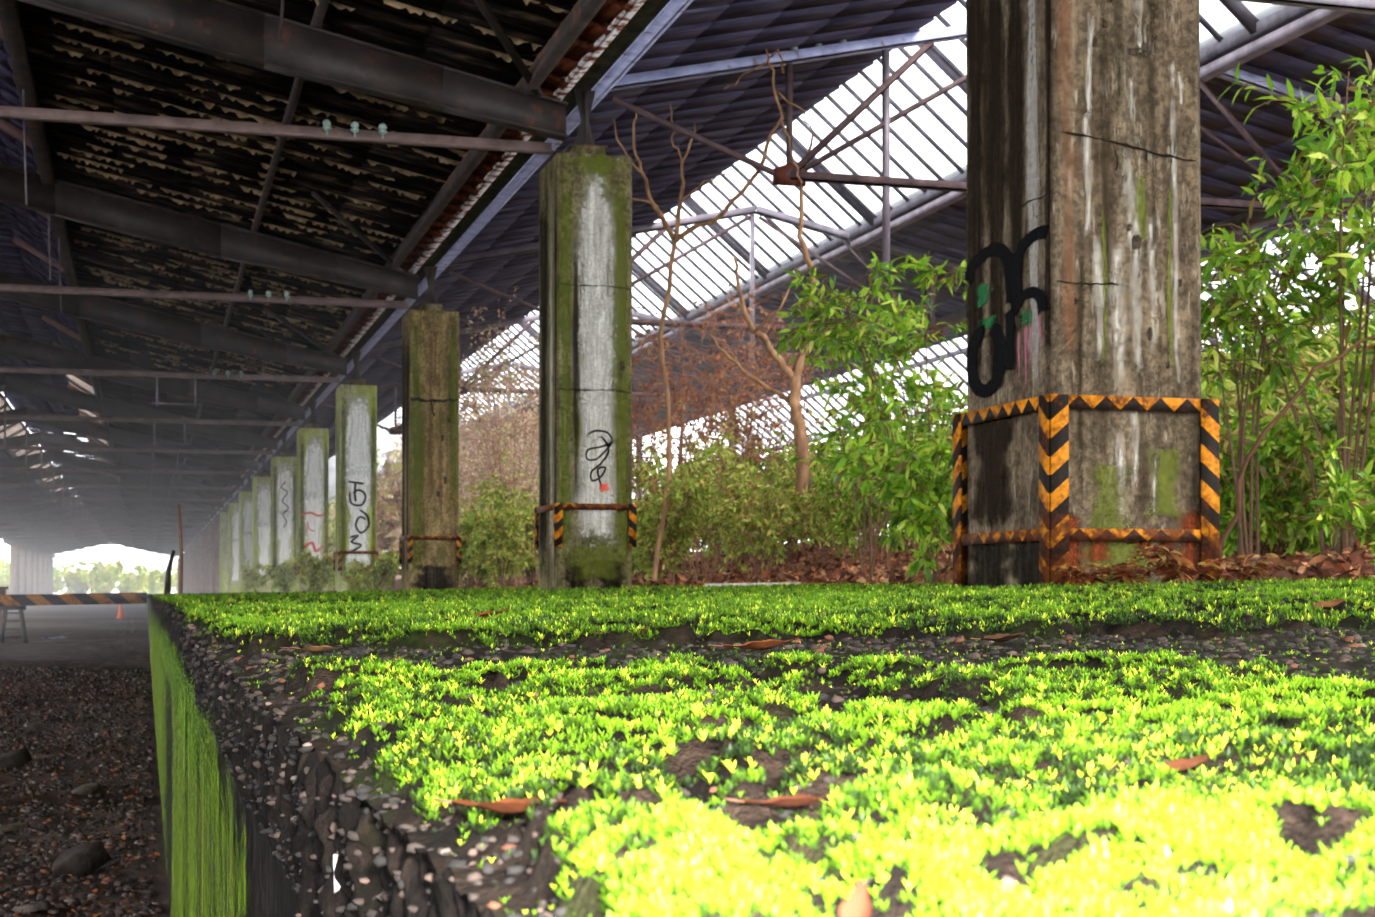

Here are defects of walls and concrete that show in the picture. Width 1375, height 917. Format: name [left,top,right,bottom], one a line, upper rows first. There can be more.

damp [402,326,451,590]
damp [539,187,624,589]
damp [967,416,1039,589]
damp [966,0,1051,374]
rust [1069,515,1109,586]
damp [1079,0,1132,489]
damp [1129,159,1176,362]
rust [1135,511,1201,580]